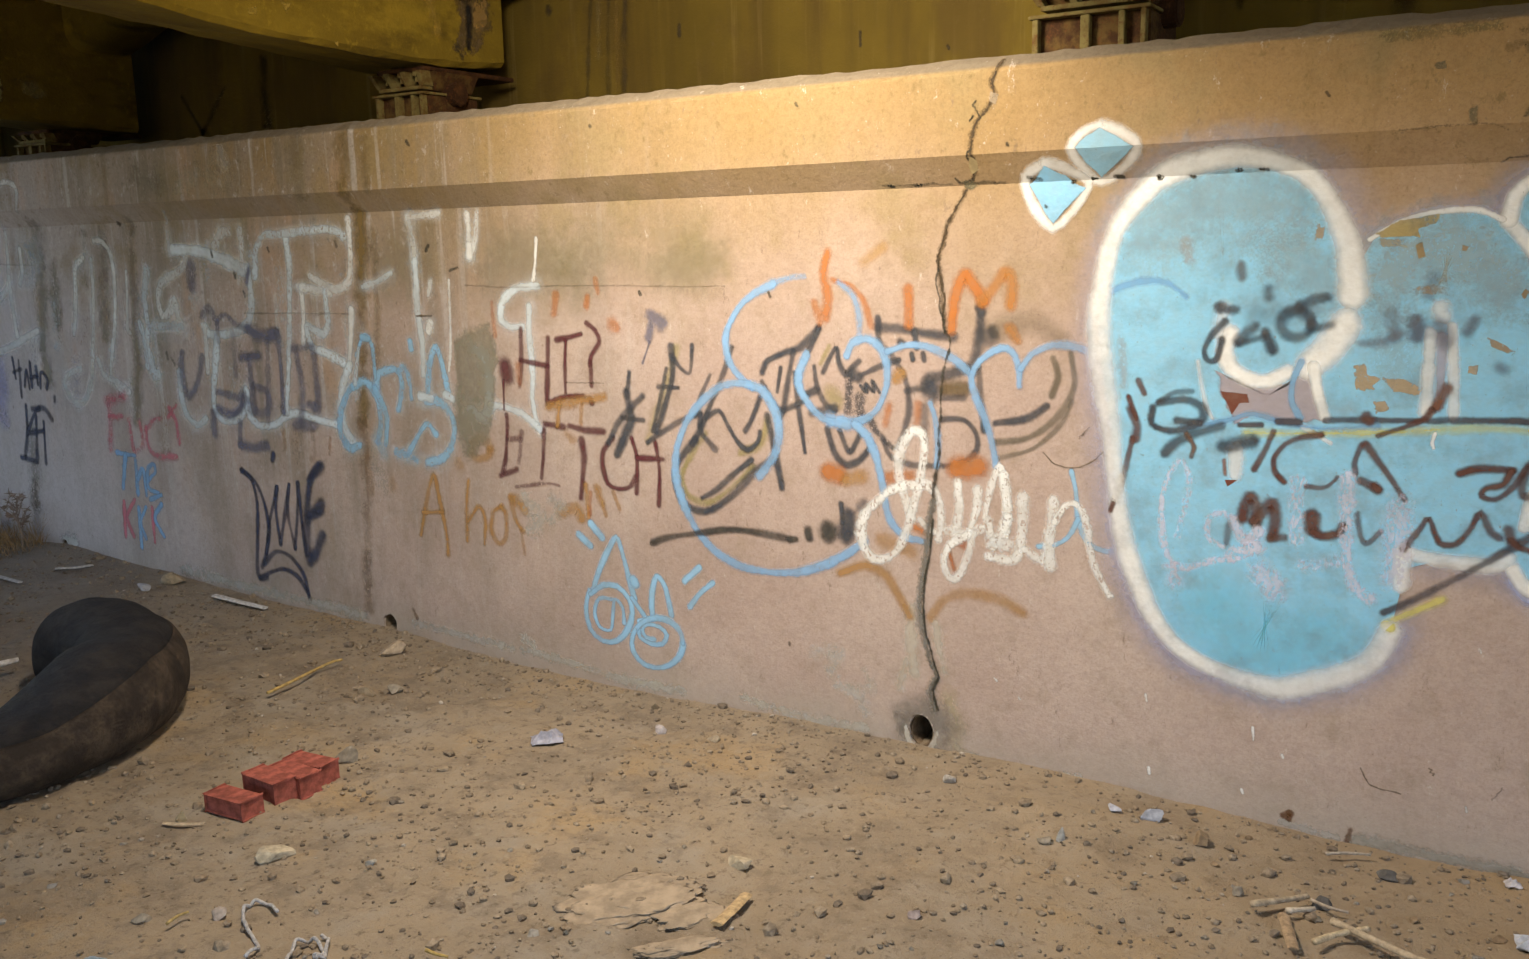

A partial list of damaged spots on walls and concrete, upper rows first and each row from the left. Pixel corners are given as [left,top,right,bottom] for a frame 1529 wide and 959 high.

crack [1027,174,1196,184]
crack [889,60,1003,714]
crack [1043,451,1104,468]